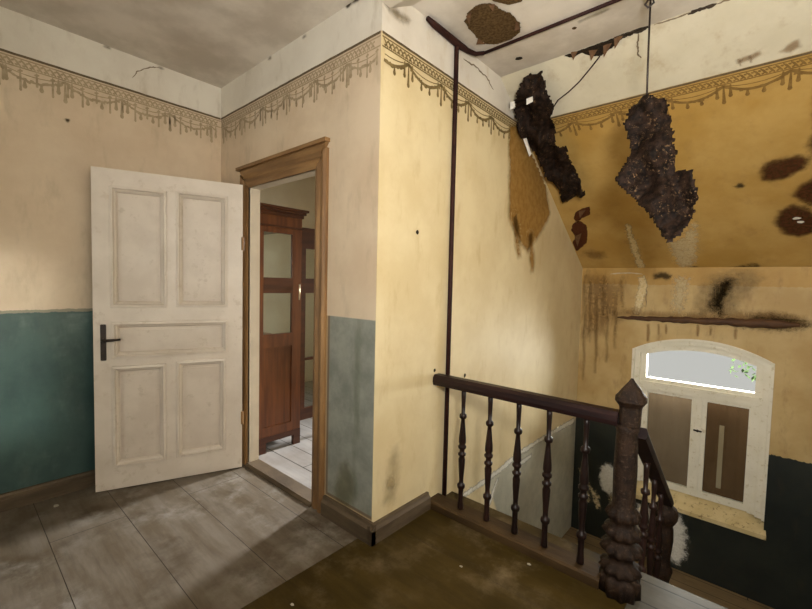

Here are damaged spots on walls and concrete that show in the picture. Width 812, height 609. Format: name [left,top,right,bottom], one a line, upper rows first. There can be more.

peeling [464,0,522,45]
spalling [565,26,648,60]
peeling [571,207,590,251]
peeling [587,464,613,509]
peeling [670,517,687,563]